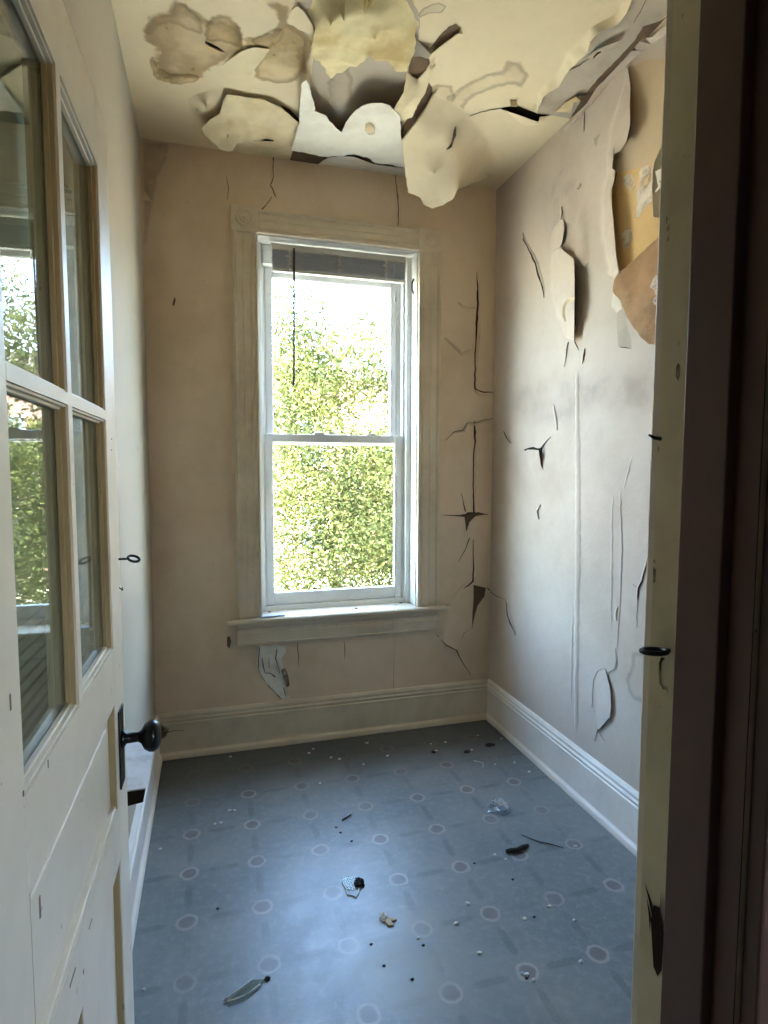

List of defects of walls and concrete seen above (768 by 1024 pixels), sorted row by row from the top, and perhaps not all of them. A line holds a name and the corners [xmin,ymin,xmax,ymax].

peeling [202,0,499,209]
peeling [533,0,667,131]
crack [262,157,276,210]
crack [522,233,545,298]
crack [437,272,516,674]
spalling [257,645,290,699]